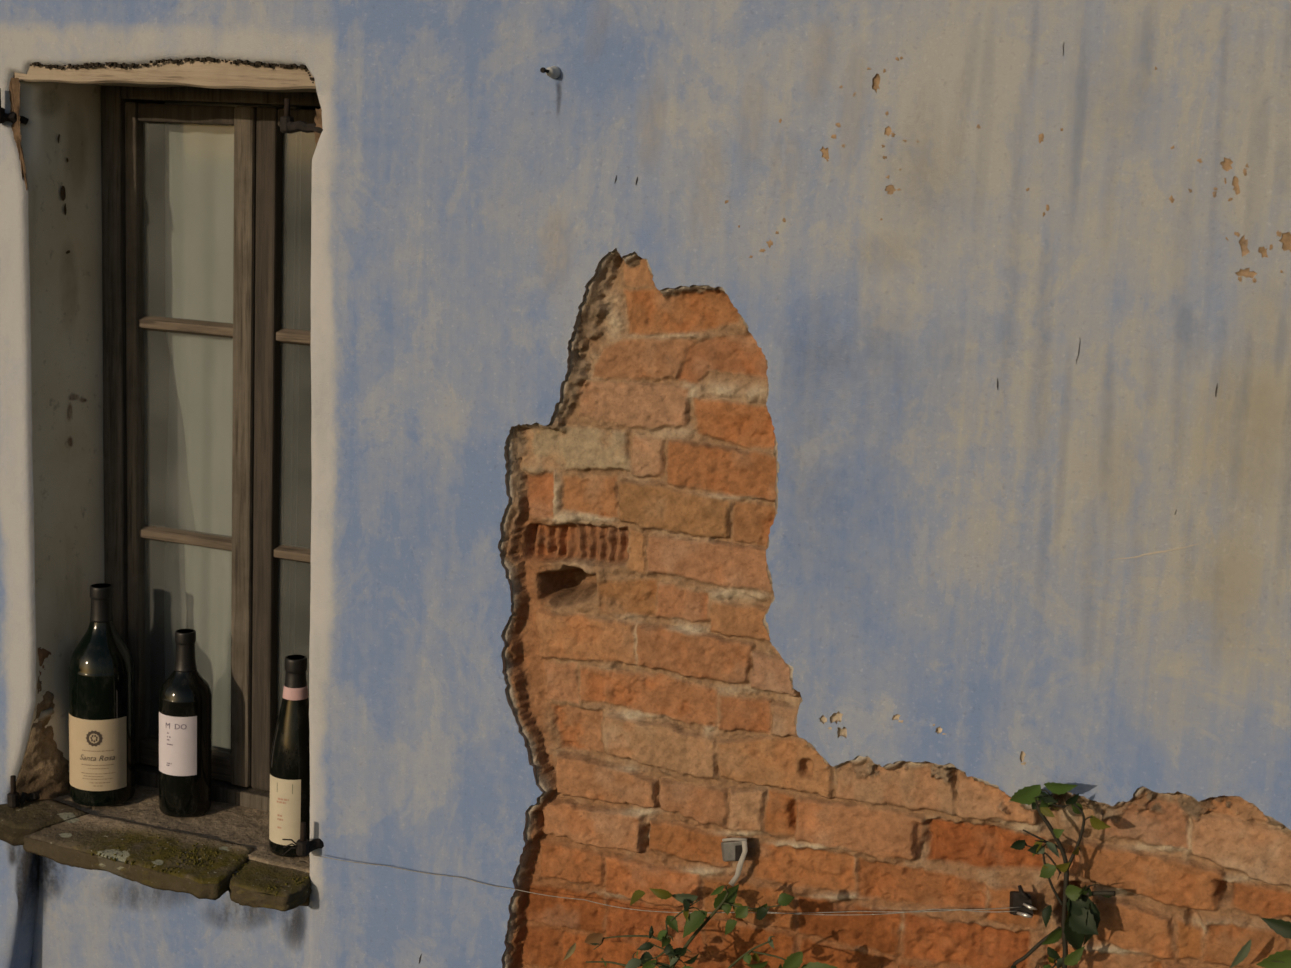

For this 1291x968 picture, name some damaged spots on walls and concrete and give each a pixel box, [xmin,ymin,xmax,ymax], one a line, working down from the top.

peeling [867,56,903,93]
peeling [820,122,845,162]
peeling [881,111,919,195]
peeling [1213,157,1249,201]
peeling [1225,230,1291,283]
flaking render [498,248,1291,968]